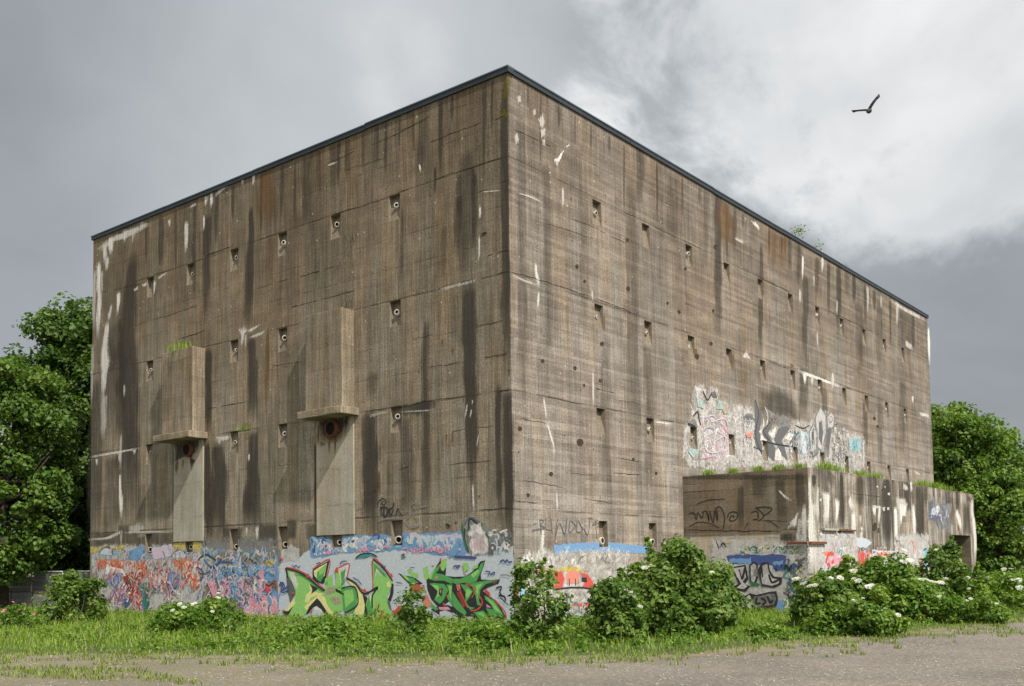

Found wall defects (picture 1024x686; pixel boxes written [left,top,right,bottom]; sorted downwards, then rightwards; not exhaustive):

damp [434,98,453,187]
damp [92,222,165,514]
damp [462,291,479,472]
damp [783,472,924,569]
damp [955,491,977,556]